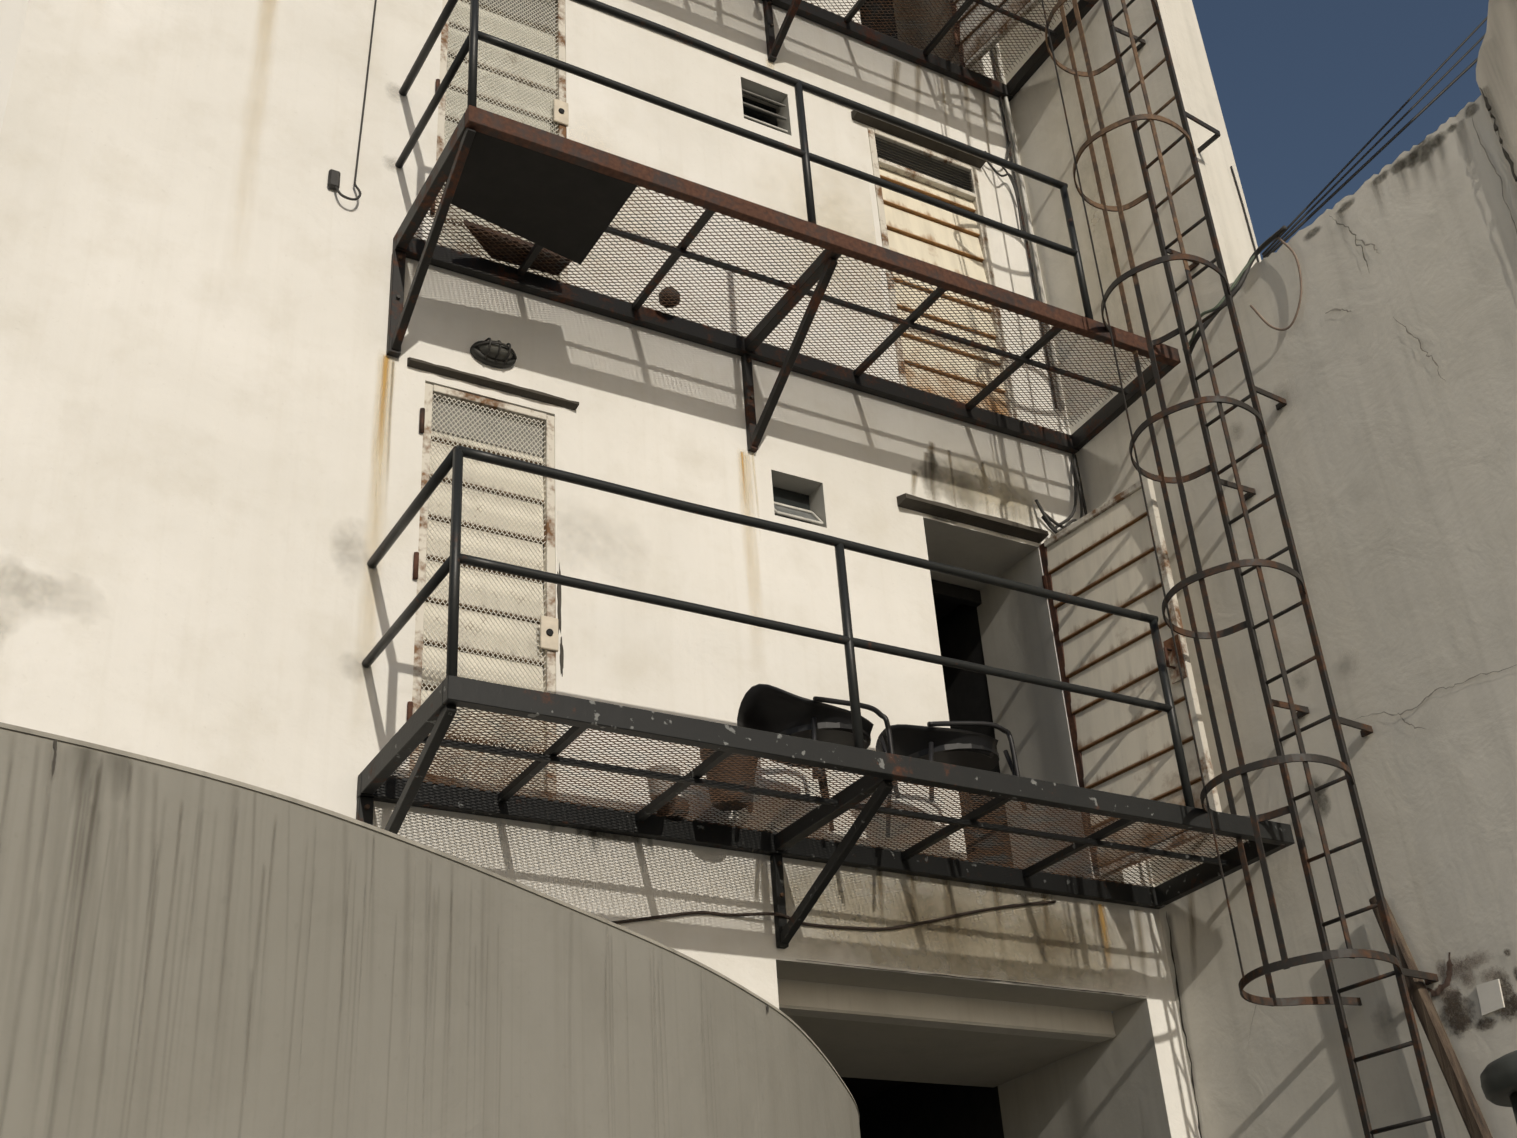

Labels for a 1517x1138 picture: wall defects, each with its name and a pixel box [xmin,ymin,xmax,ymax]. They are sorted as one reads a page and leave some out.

damp [1378,107,1475,179]
crack [1330,216,1378,271]
crack [1393,317,1443,379]
corrosion [379,356,394,460]
damp [914,443,1013,505]
crack [1355,665,1515,729]